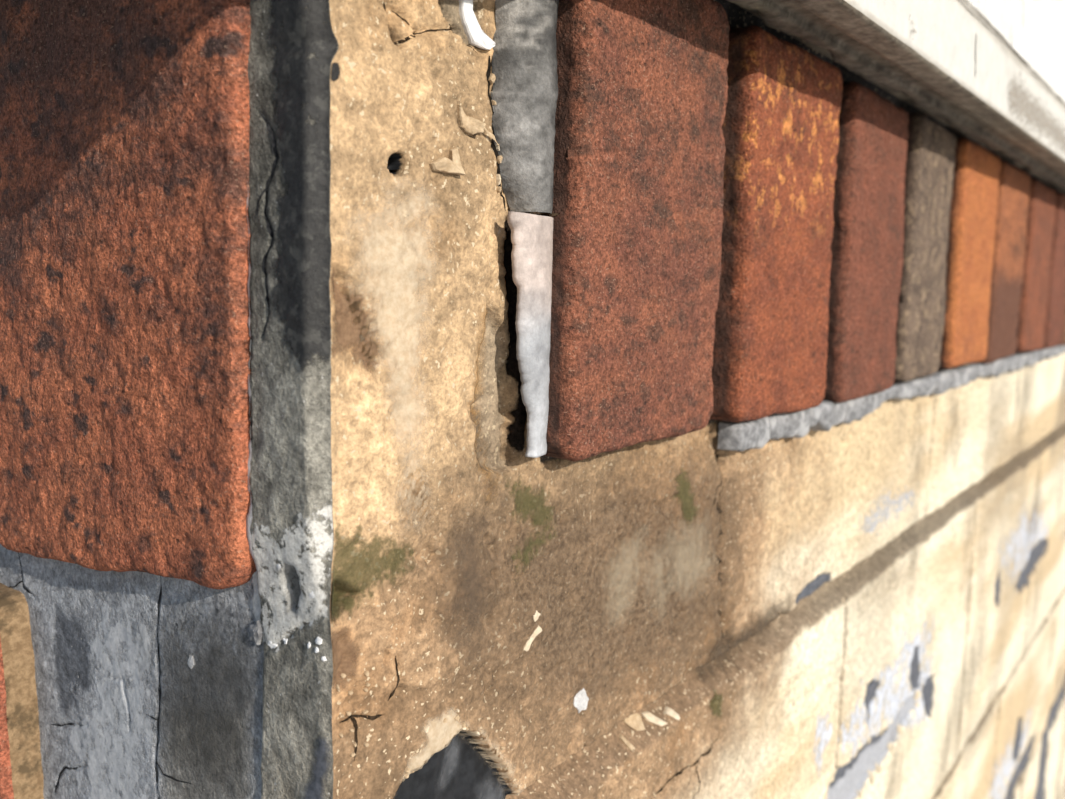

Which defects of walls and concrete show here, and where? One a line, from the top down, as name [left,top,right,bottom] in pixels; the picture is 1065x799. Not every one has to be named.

crack [383,3,477,53]
spalling [429,147,465,176]
crack [257,111,279,338]
peeling [457,0,559,458]
peeling [246,197,371,696]
peeling [995,502,1049,605]
crack [129,576,191,799]
spalling [338,709,369,757]
crack [340,657,400,760]
spalling [393,709,520,799]
peeling [813,616,936,799]
peeling [988,679,1065,799]